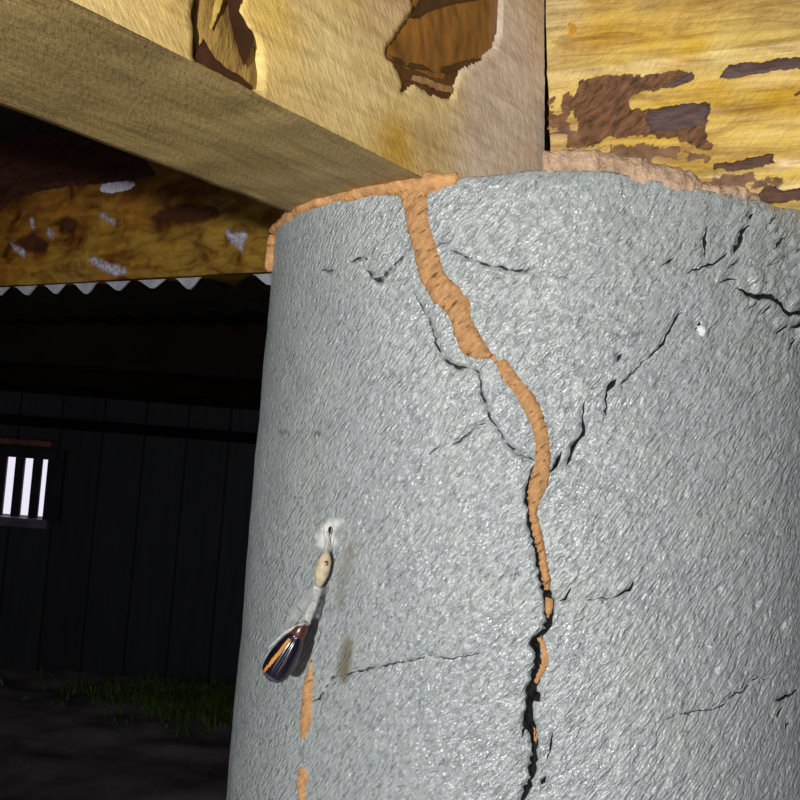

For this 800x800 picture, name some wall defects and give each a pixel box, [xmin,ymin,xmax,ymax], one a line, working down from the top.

crack [350,249,410,282]
crack [440,243,529,272]
crack [660,213,800,350]
crack [604,312,700,415]
crack [413,292,585,800]
crack [588,581,633,600]
crack [314,653,481,702]